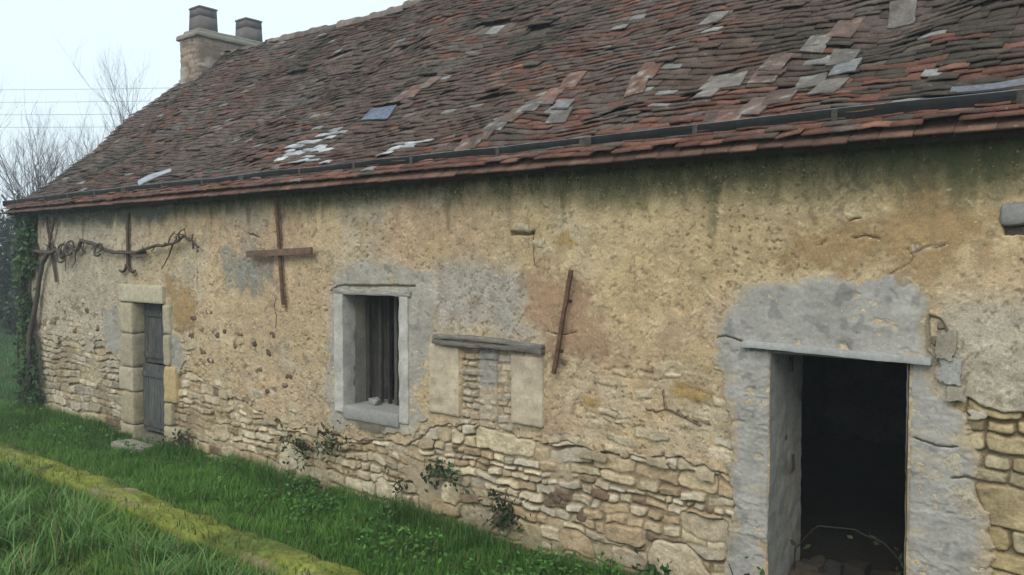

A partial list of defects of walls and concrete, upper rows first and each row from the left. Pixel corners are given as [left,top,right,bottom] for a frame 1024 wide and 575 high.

damp [782,183,981,281]
crack [647,391,699,426]
flaking render [591,488,610,501]